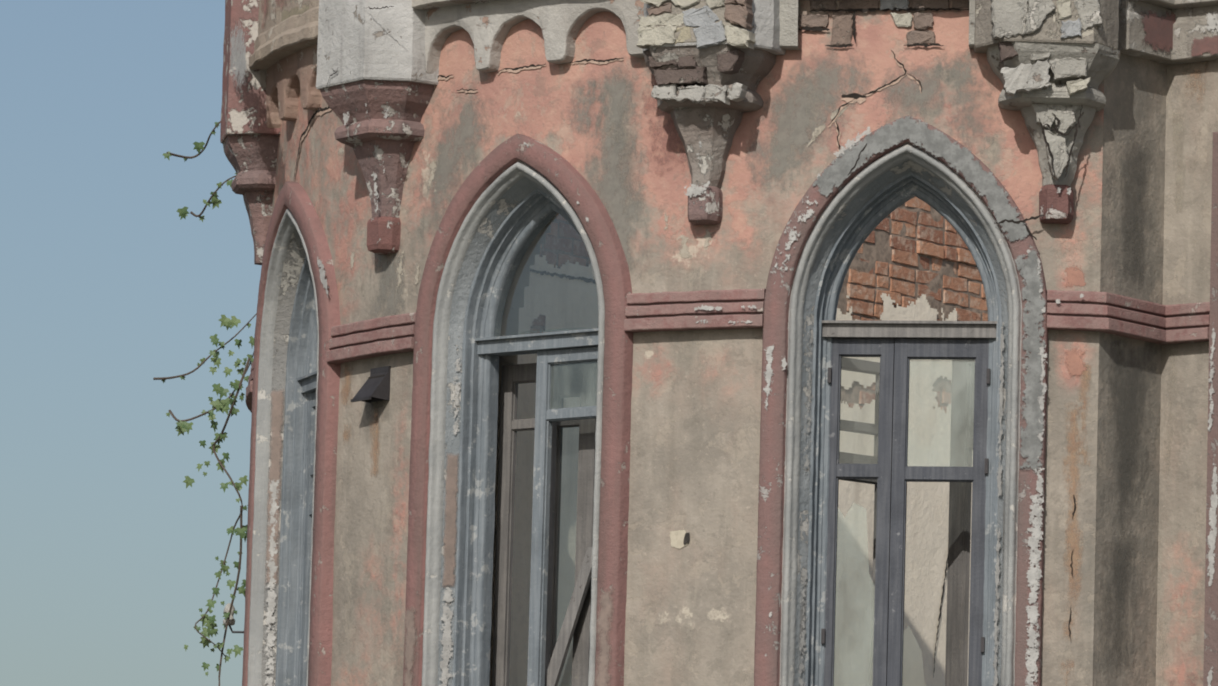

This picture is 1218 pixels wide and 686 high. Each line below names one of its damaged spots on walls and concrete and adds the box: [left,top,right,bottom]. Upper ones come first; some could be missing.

crack [294,68,338,180]
crack [438,58,624,93]
spalling [636,0,756,105]
crack [798,7,969,48]
crack [828,43,944,175]
spalling [990,0,1102,195]
peeling [684,181,710,198]
peeling [763,344,787,408]
peeling [770,116,1061,686]
peeling [264,390,283,686]
peeling [439,454,458,686]
peeling [1207,463,1218,586]